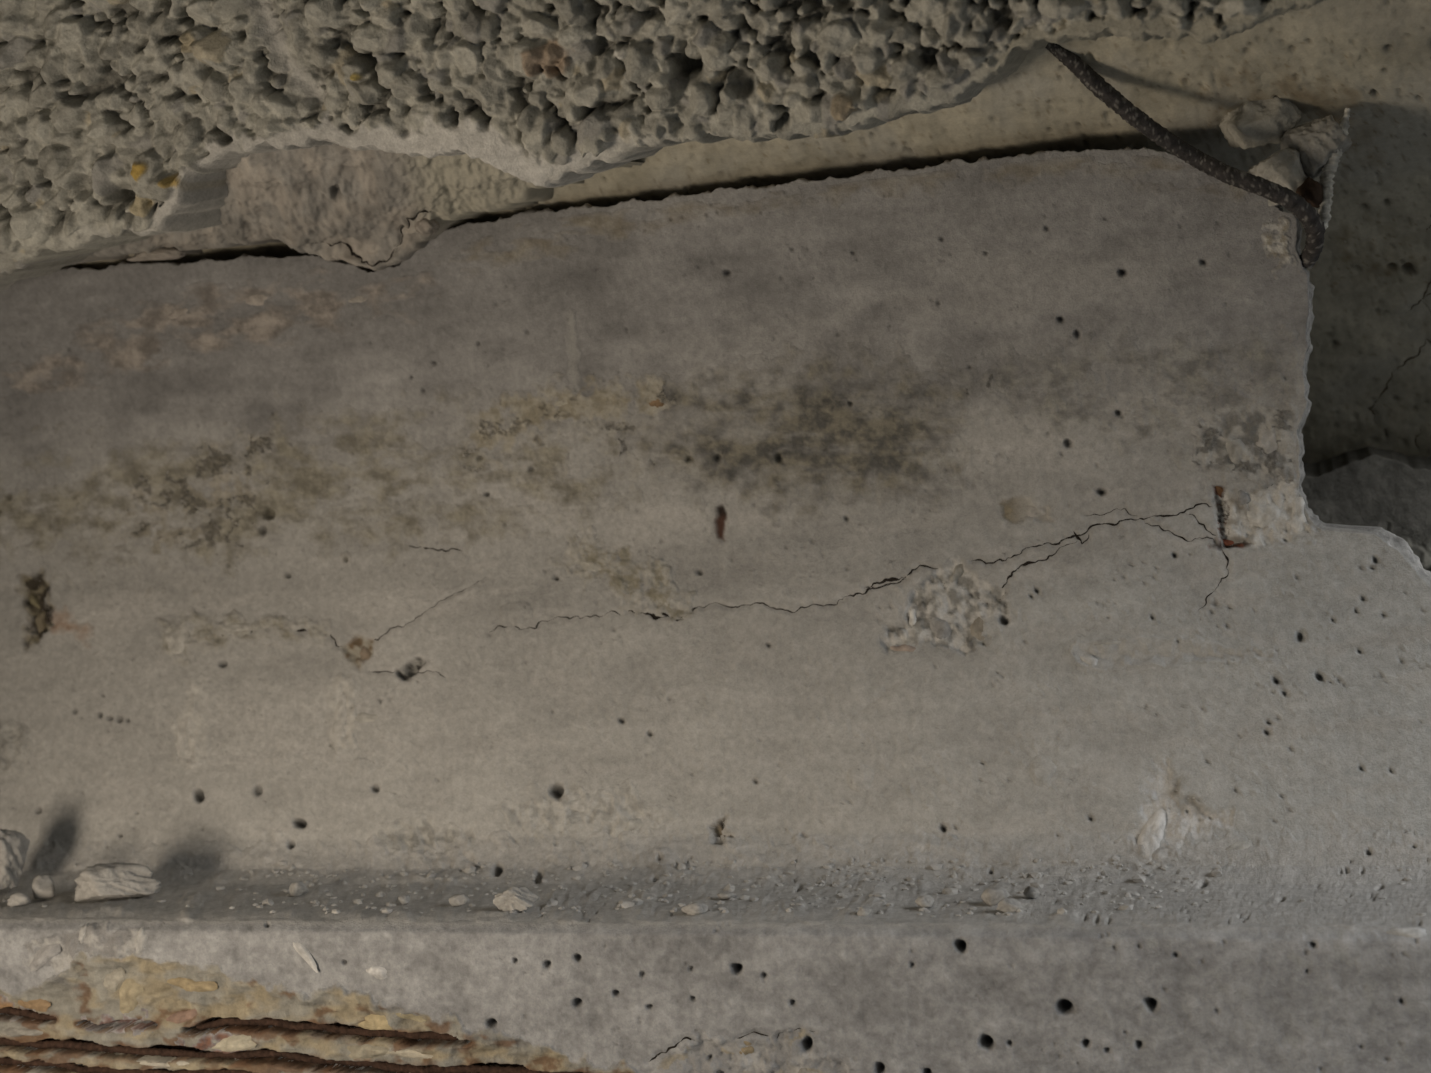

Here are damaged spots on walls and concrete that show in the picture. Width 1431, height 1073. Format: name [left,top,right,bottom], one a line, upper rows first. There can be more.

rust [1296,177,1323,208]
spalling [1318,108,1350,229]
crack [1368,282,1431,421]
crack [973,503,1229,608]
crack [491,565,945,632]
peeling [1386,927,1427,938]
rust [0,994,36,1022]
rust [81,1008,156,1036]
rust [174,1026,248,1054]
spalling [0,920,849,1073]